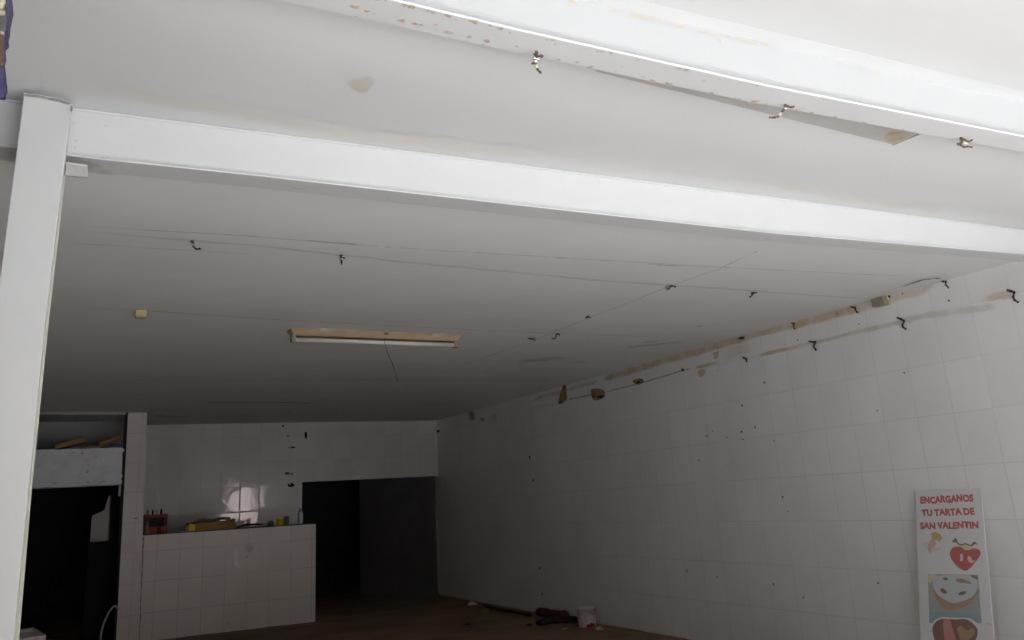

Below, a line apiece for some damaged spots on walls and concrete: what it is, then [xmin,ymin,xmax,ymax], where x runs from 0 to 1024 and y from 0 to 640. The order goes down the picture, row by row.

corrosion [396,4,511,45]
water stain [43,69,549,166]
spalling [558,385,567,404]
spalling [591,389,605,400]